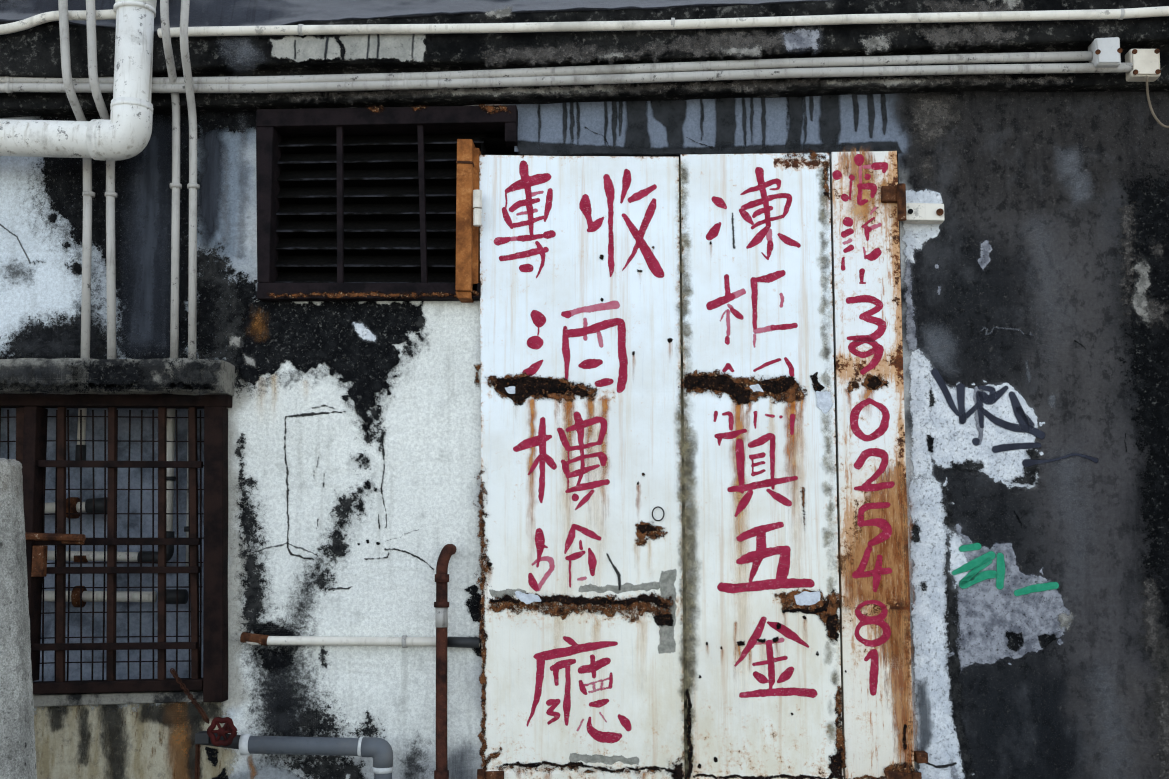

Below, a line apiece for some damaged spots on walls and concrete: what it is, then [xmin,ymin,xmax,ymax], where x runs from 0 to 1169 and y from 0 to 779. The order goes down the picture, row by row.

water stain [481,28,820,68]
water stain [861,35,890,55]
water stain [268,74,1074,156]
rust [778,148,886,222]
peeling [906,92,961,204]
water stain [0,110,259,401]
rust [668,264,691,350]
peeling [902,224,1074,779]
water stain [1115,170,1169,779]
water stain [235,422,388,738]
rust [473,369,917,779]
water stain [265,754,366,779]